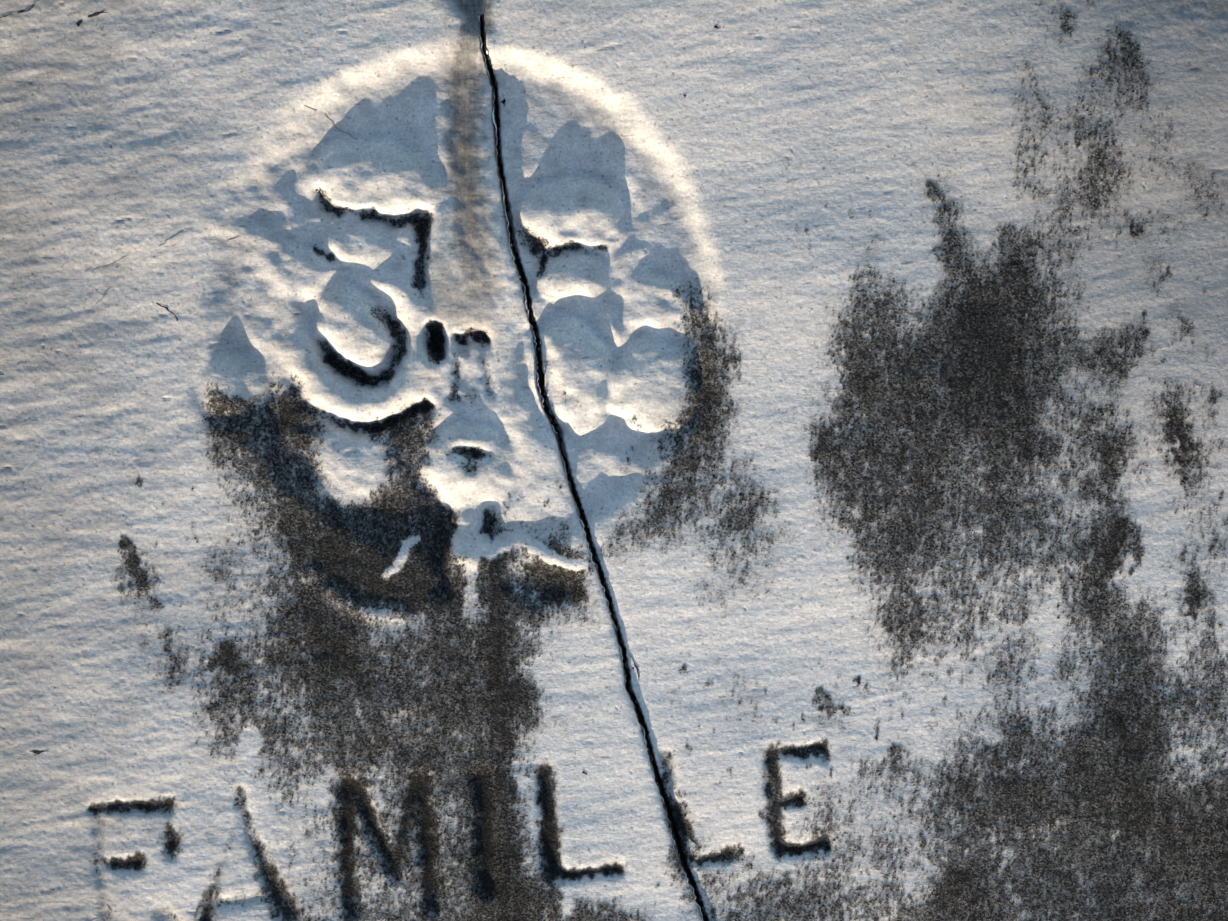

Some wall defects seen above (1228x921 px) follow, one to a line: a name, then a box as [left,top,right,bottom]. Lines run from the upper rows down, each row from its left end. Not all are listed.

leakage [454,0,490,237]
leakage [1035,3,1078,43]
leakage [313,188,434,298]
leakage [516,225,607,277]
crack [478,16,708,921]
leakage [654,23,1228,921]
leakage [114,278,789,921]